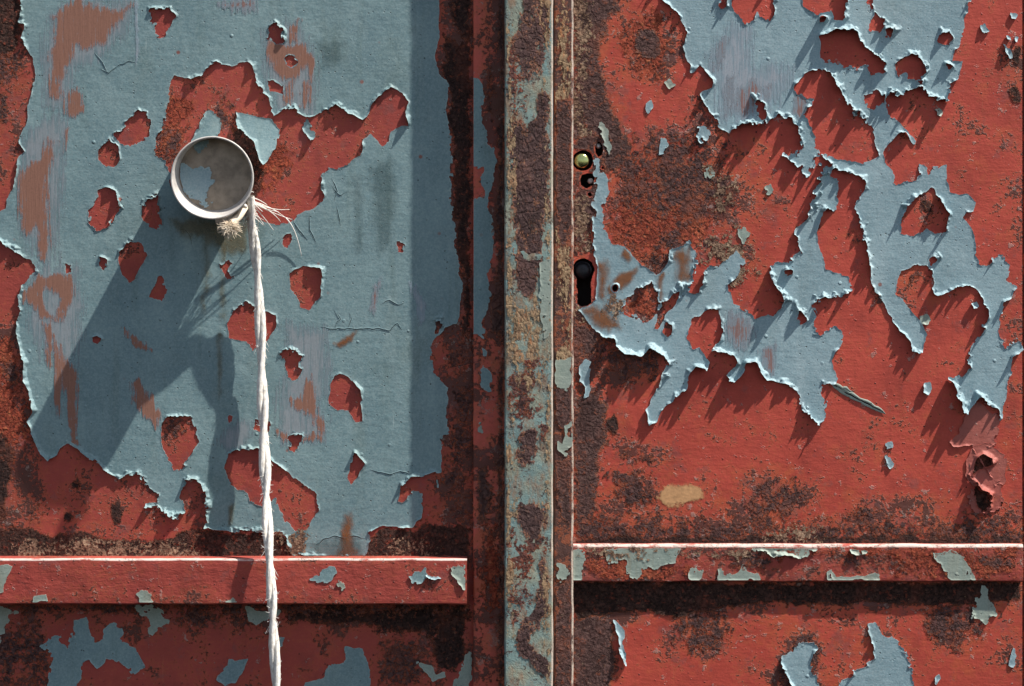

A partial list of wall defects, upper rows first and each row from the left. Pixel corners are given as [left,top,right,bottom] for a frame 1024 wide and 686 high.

corrosion [0,0,30,124]
peeling [579,0,1024,426]
peeling [0,0,497,593]
corrosion [338,0,1024,686]
peeling [605,548,681,579]
peeling [717,564,761,580]
peeling [39,617,145,686]
corrosion [0,600,472,686]
peeling [304,646,371,686]
peeling [613,620,627,666]
peeling [781,642,819,686]
peeling [839,622,914,686]